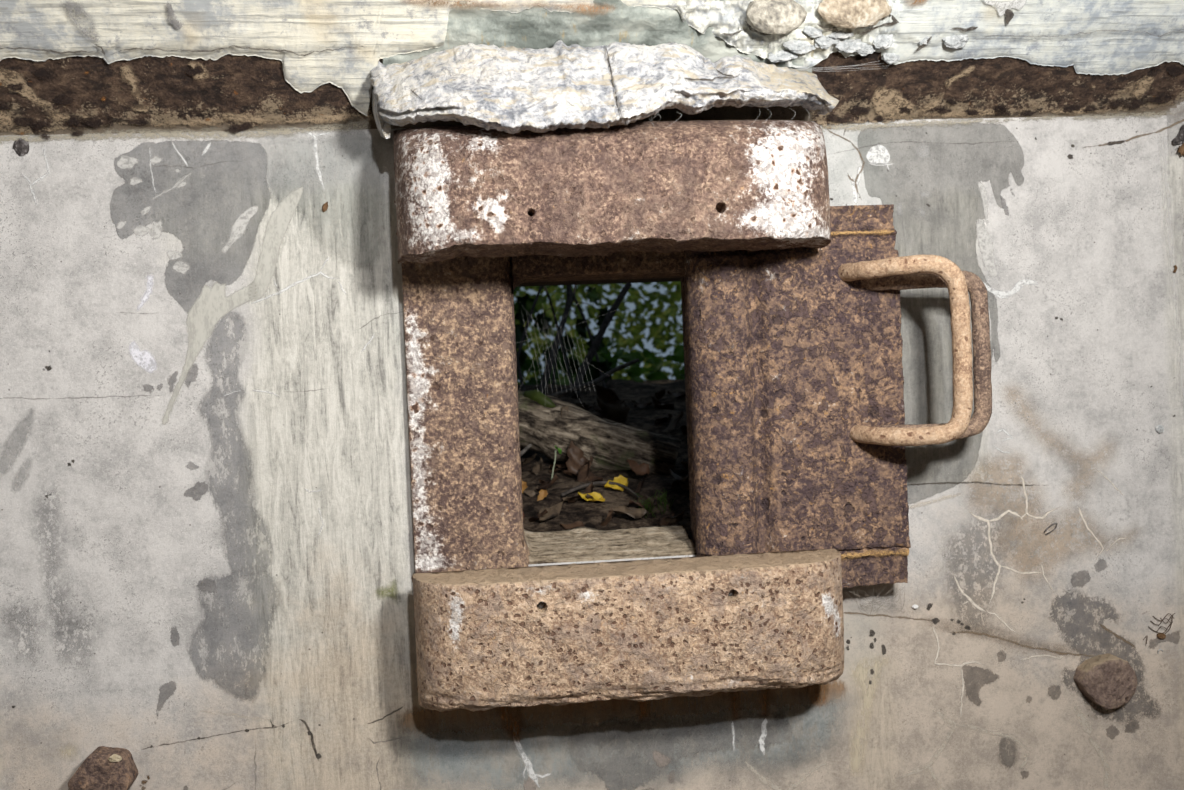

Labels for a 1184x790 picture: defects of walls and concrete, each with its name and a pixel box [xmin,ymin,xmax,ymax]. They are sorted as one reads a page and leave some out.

spalling [0,0,1184,143]
crack [1067,119,1184,159]
leakage [110,134,378,313]
leakage [858,123,1037,362]
leakage [900,288,953,425]
leakage [143,313,278,700]
leakage [905,432,982,504]
crack [145,714,321,765]
leakage [406,703,839,790]
crack [844,477,1126,712]
leakage [1048,559,1180,790]
crack [1101,625,1135,648]